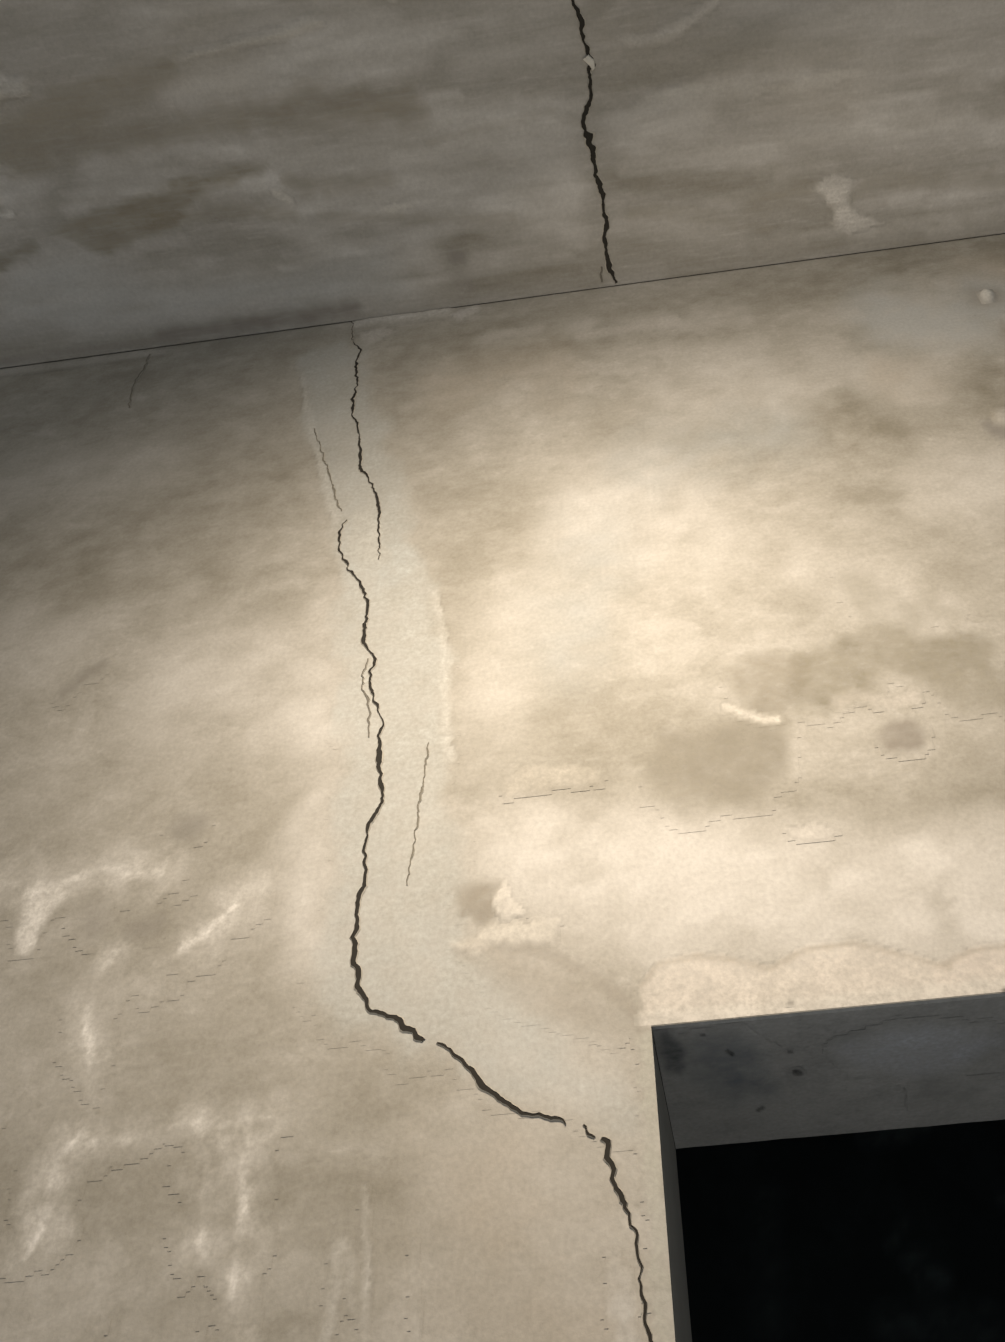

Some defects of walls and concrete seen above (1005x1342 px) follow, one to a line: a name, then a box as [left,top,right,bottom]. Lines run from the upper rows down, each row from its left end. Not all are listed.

crack [415,0,1005,313]
leakage [0,803,298,1342]
crack [0,320,654,1342]
leakage [314,1180,377,1342]